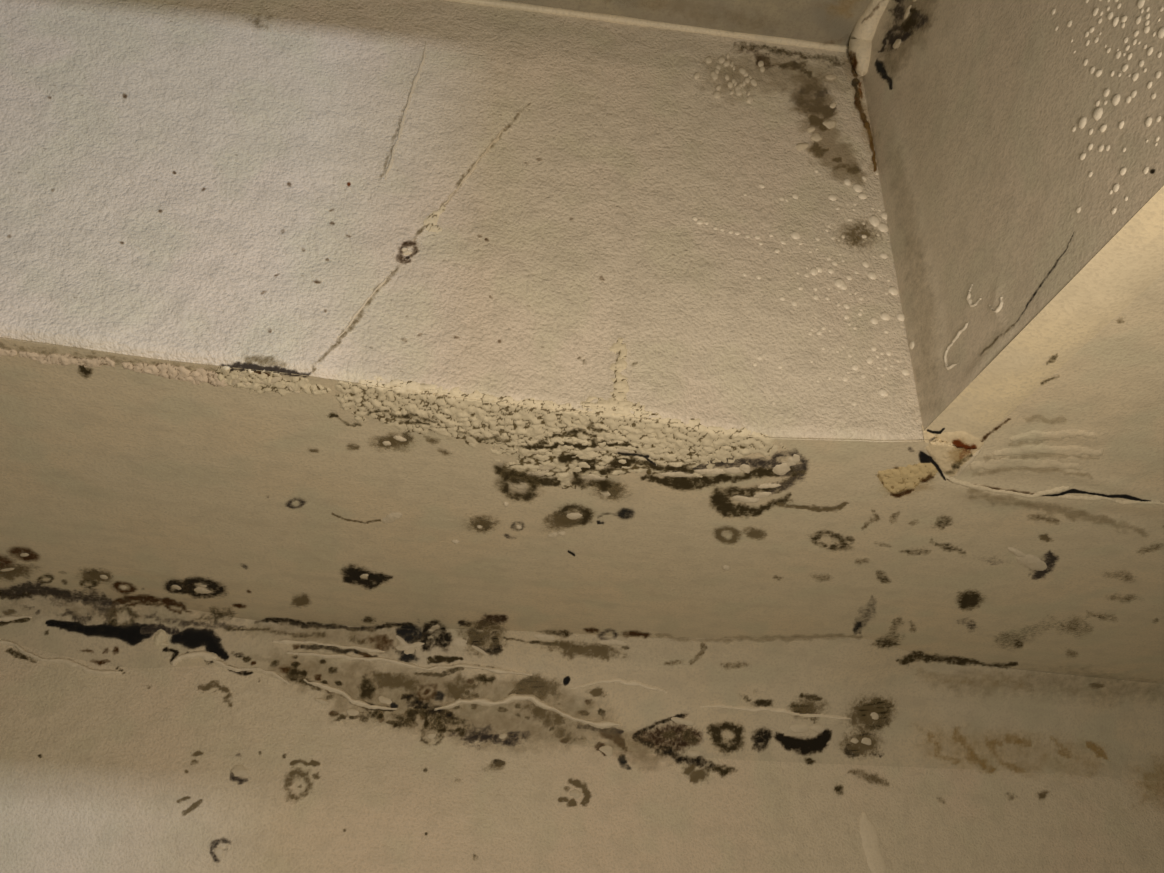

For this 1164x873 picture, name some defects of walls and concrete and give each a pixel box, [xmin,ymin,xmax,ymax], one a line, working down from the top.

water stain [739,44,861,174]
crack [982,233,1074,354]
crack [981,419,1011,442]
water stain [494,452,849,544]
spalling [877,447,982,498]
crack [943,474,1164,506]
peeling [0,615,122,676]
water stain [0,547,650,746]
peeling [271,639,533,677]
mould [876,618,1018,668]
peeling [303,679,397,712]
water stain [595,693,894,785]